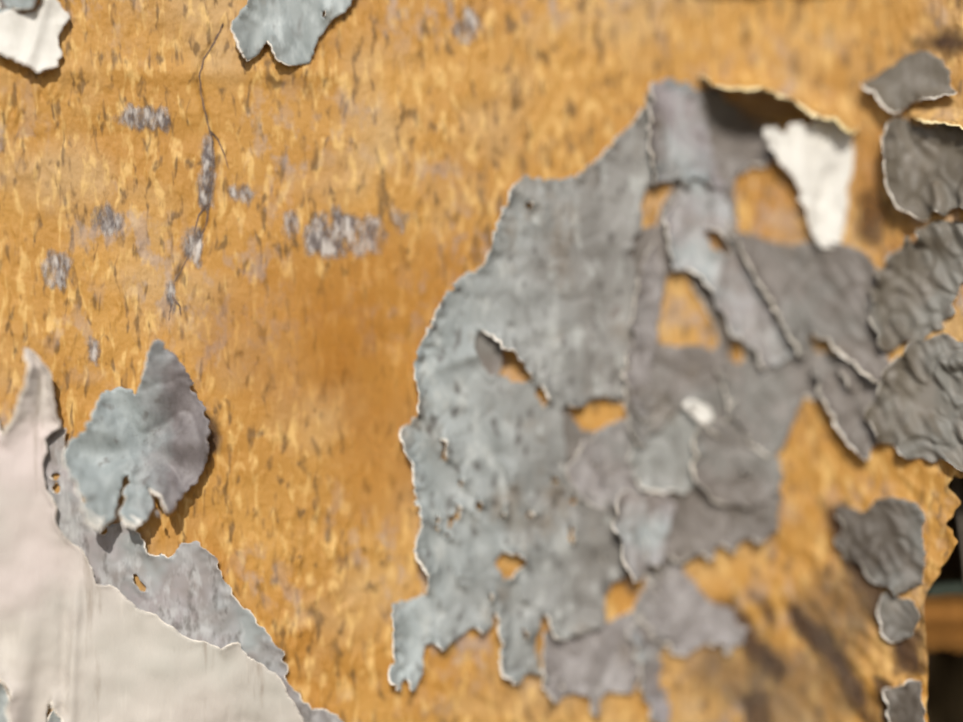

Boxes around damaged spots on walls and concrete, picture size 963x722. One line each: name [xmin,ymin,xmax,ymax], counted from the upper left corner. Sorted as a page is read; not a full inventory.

peeling [0,0,70,73]
crack [168,23,229,321]
peeling [230,0,352,66]
peeling [0,339,304,722]
peeling [388,51,963,722]